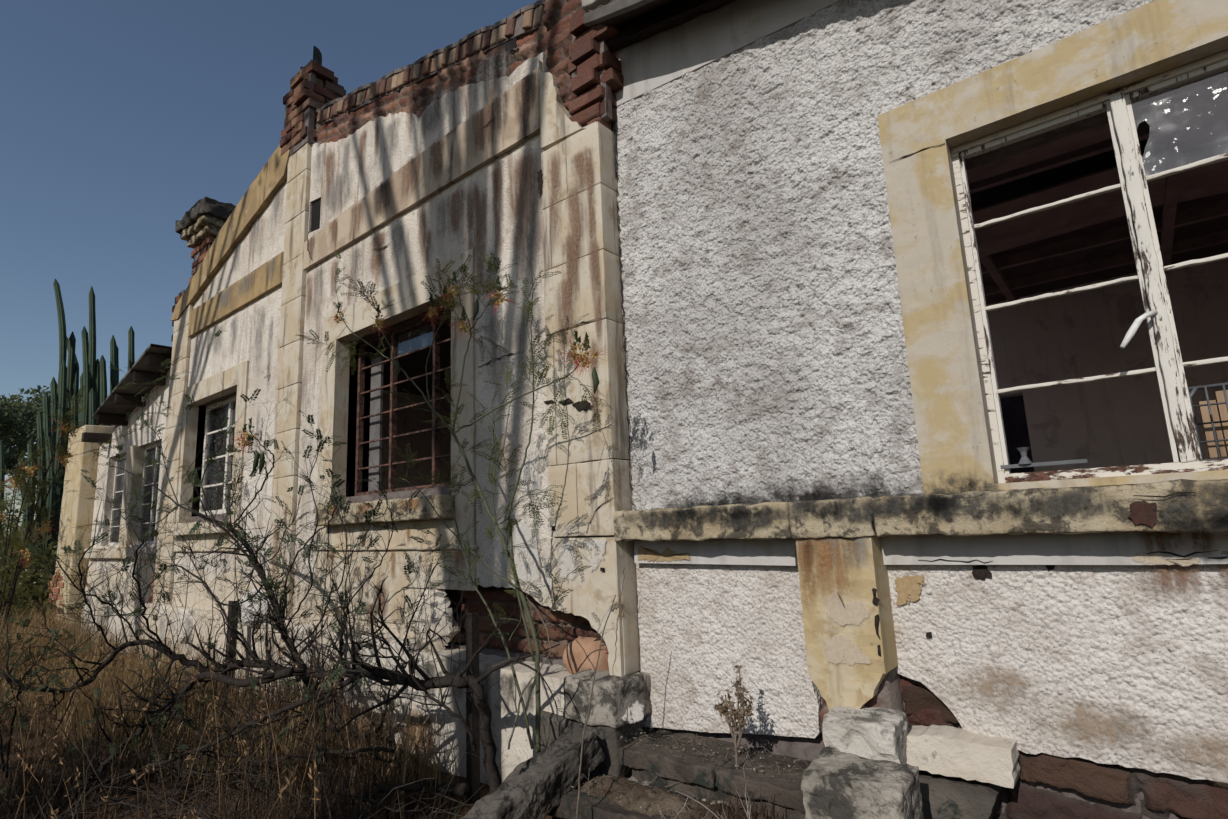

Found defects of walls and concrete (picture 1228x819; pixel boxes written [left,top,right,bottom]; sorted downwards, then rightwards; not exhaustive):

water stain [472,57,535,144]
water stain [316,122,444,241]
water stain [354,226,402,269]
water stain [419,154,596,360]
water stain [514,278,535,414]
flaking render [518,450,541,503]
water stain [624,478,1112,529]
crack [1134,491,1195,499]
water stain [1145,484,1228,590]
spalling [444,518,609,659]
peeling [894,575,928,606]